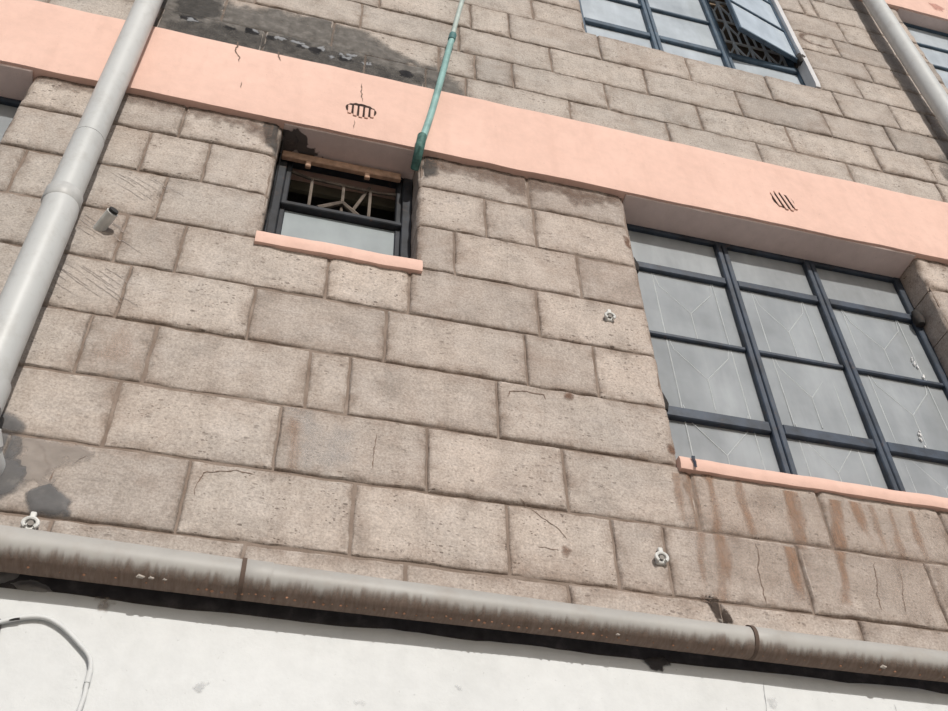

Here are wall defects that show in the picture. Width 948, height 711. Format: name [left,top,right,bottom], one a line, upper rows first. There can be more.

leakage [154,0,464,96]
crack [194,470,255,495]
corrosion [830,499,864,580]
crack [755,544,767,605]
crack [874,568,906,611]